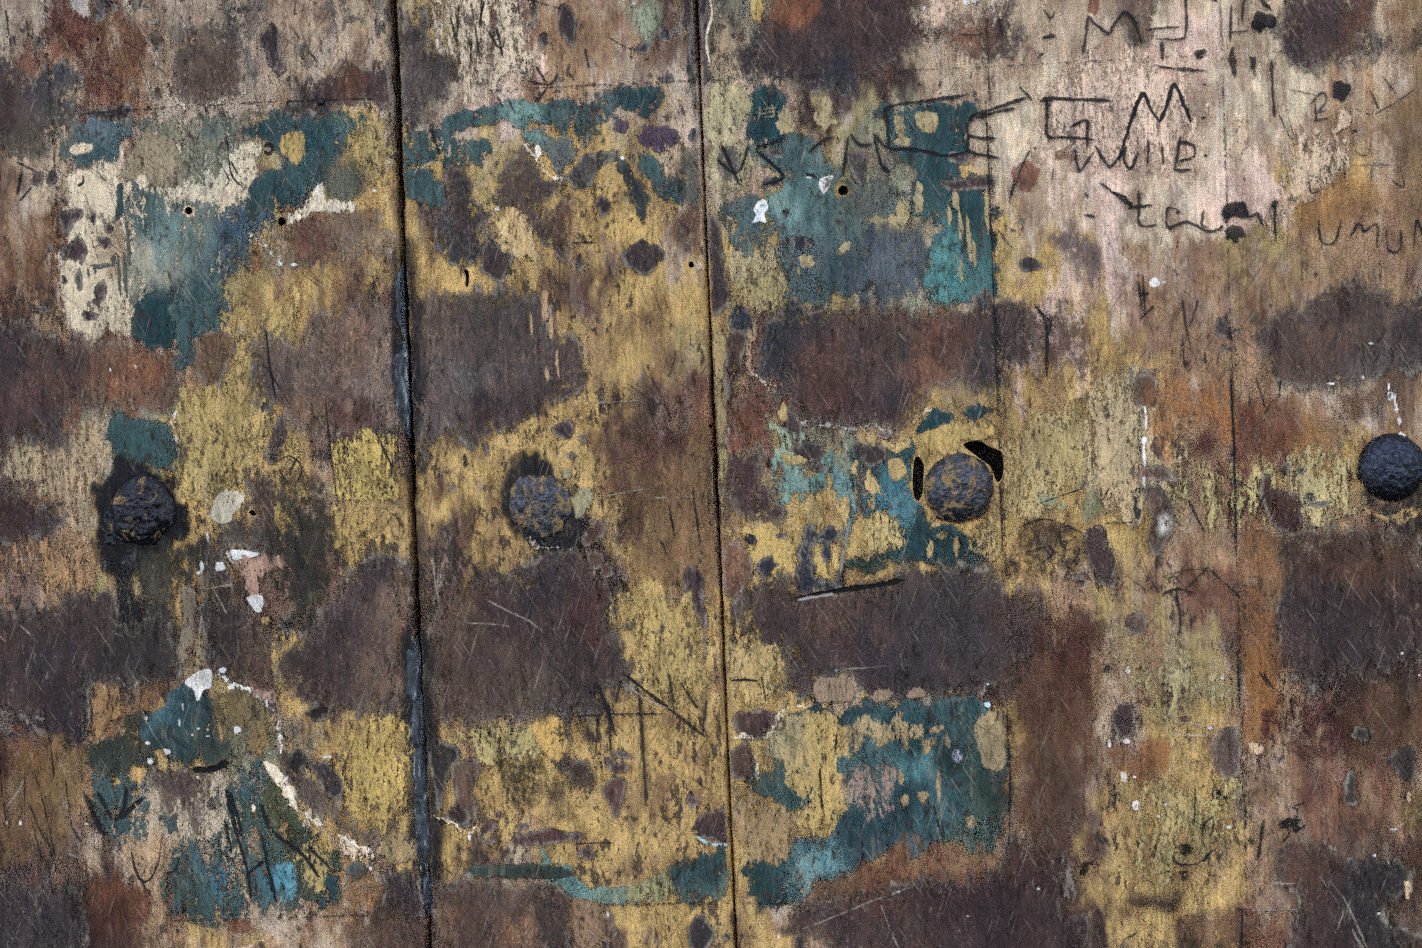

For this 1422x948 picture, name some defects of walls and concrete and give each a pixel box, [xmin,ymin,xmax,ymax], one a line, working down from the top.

peeling [0,34,134,187]
peeling [92,0,488,167]
peeling [522,1,577,50]
peeling [732,0,1031,158]
peeling [620,238,664,276]
rust [91,454,190,633]
peeling [0,118,644,861]
rust [500,450,585,556]
rust [590,422,684,542]
peeling [683,565,709,662]
peeling [700,151,1053,809]
peeling [685,791,728,847]